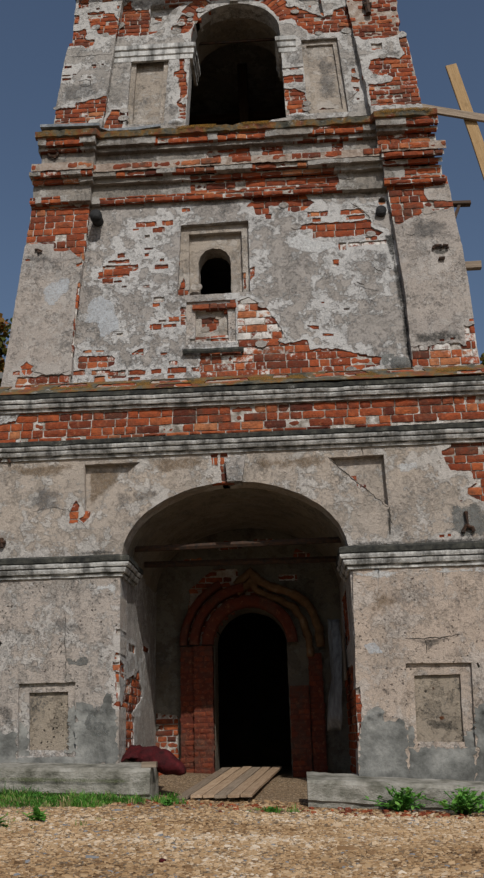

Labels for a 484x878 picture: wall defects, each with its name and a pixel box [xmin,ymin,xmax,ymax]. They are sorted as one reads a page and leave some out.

spalling [69,0,217,48]
spalling [255,0,421,106]
spalling [53,96,129,129]
spalling [174,59,188,119]
spalling [282,67,325,115]
spalling [26,116,453,267]
flaking render [98,253,138,287]
spalling [13,267,484,390]
spalling [0,395,484,443]
crack [328,457,393,533]
spalling [442,442,484,501]
spalling [345,666,362,774]